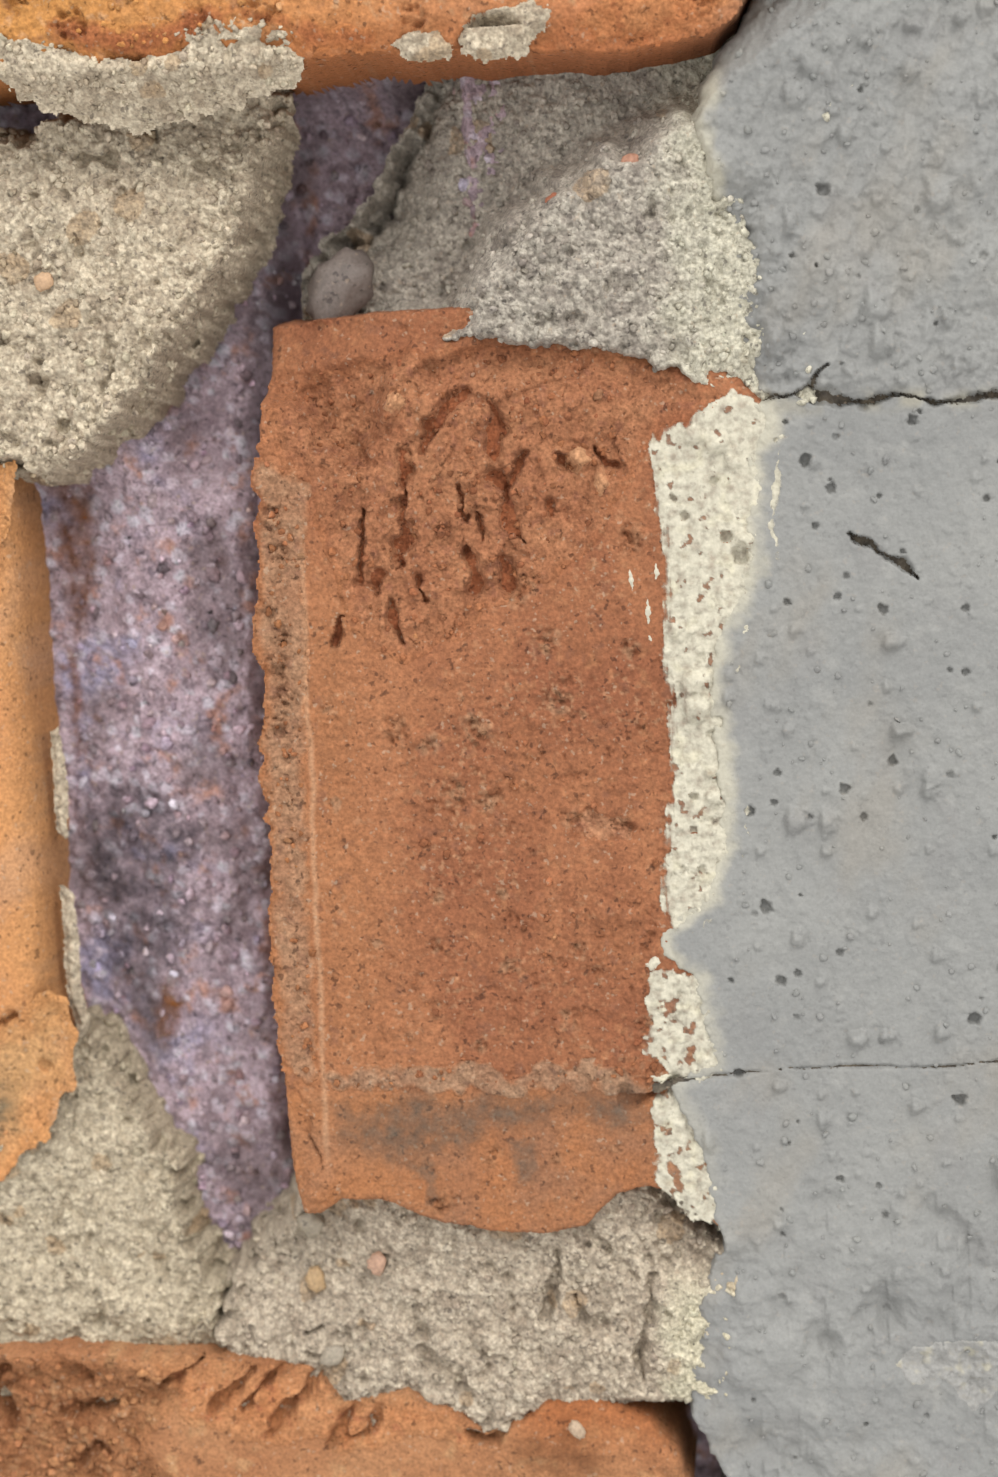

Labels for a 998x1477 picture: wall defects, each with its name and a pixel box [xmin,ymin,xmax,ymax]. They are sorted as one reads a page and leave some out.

spalling [44,1,380,61]
spalling [573,0,743,46]
crack [763,363,998,407]
spalling [0,460,17,545]
spalling [250,342,784,1086]
spalling [0,990,79,1181]
crack [323,1057,998,1101]
peeling [642,956,725,1230]
spalling [0,1347,489,1477]
peeling [896,1339,998,1411]